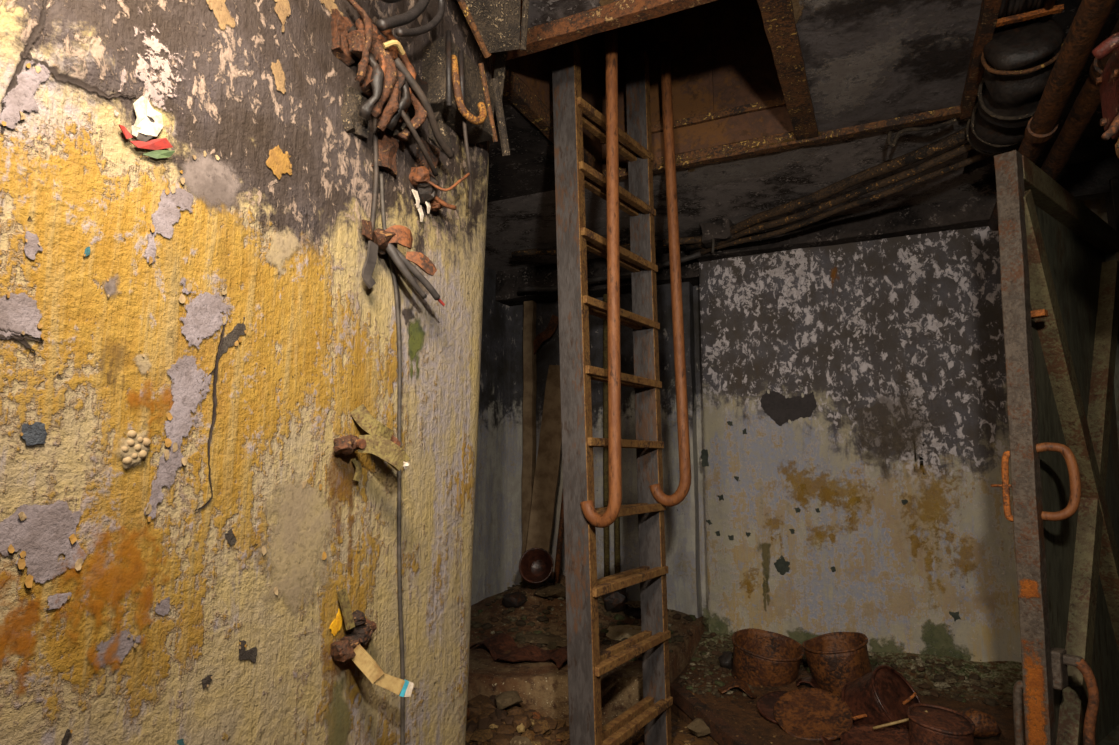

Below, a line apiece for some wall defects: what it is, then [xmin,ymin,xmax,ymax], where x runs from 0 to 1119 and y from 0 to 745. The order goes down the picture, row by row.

peeling [274,0,291,33]
peeling [0,60,50,129]
damp [118,7,187,123]
peeling [266,145,292,179]
peeling [143,151,241,265]
peeling [0,291,44,340]
peeling [144,277,247,522]
damp [705,339,725,379]
spalling [760,390,817,426]
damp [848,302,871,383]
damp [905,372,943,483]
peeling [0,500,87,610]